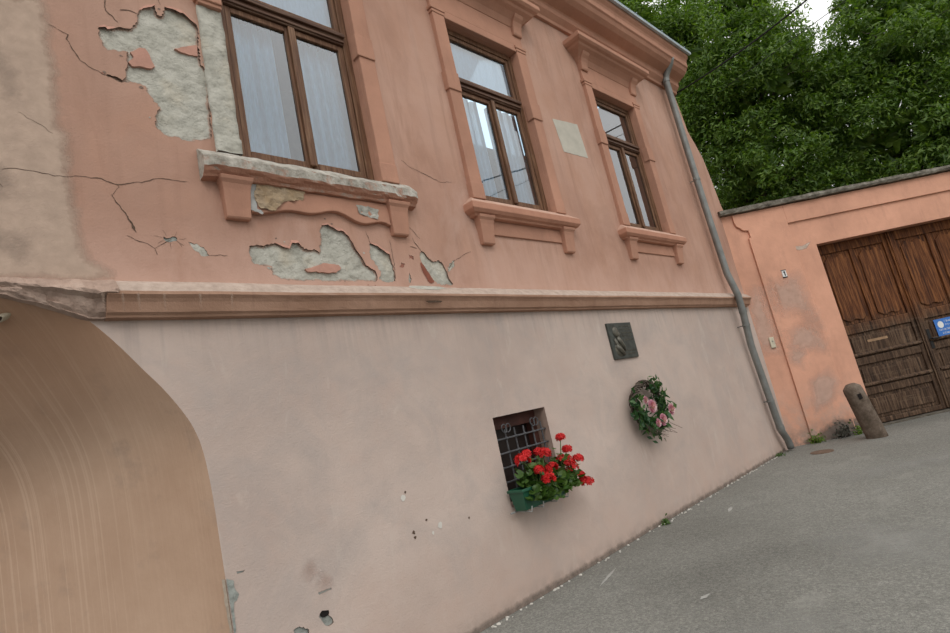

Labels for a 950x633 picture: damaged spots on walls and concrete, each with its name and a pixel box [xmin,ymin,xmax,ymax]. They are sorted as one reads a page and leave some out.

flaking render [98,4,243,156]
crack [0,168,187,253]
spalling [251,184,305,214]
spalling [356,205,379,219]
flaking render [249,218,469,303]
spalling [319,610,333,626]